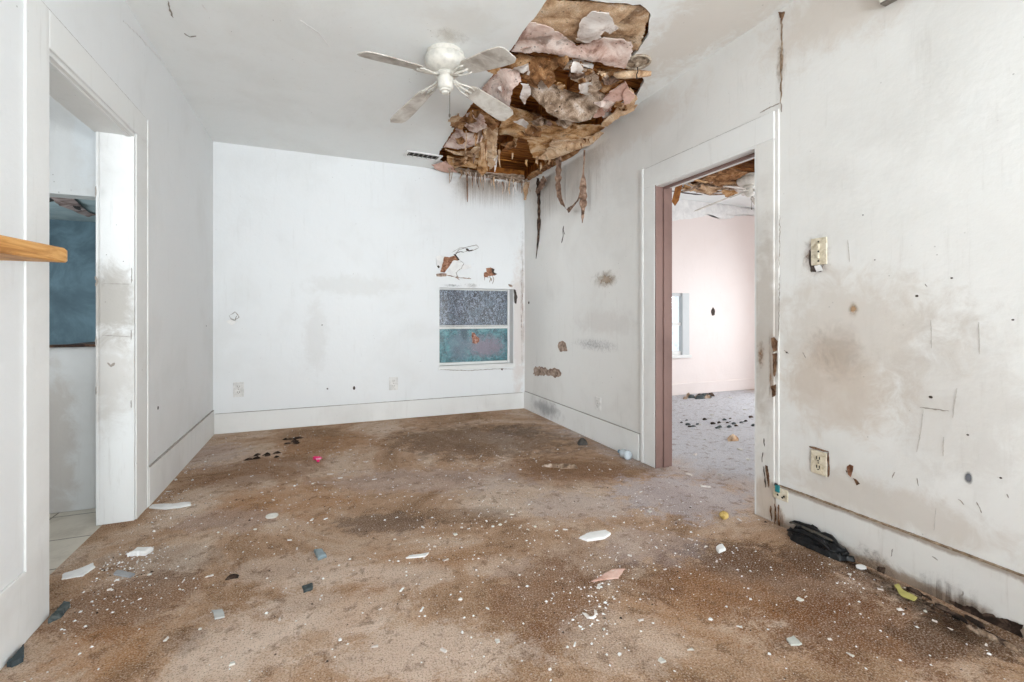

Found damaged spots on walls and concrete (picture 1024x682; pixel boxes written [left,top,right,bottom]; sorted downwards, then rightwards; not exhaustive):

crack [760,11,785,113]
flaking render [435,254,471,280]
flaking render [533,366,561,378]